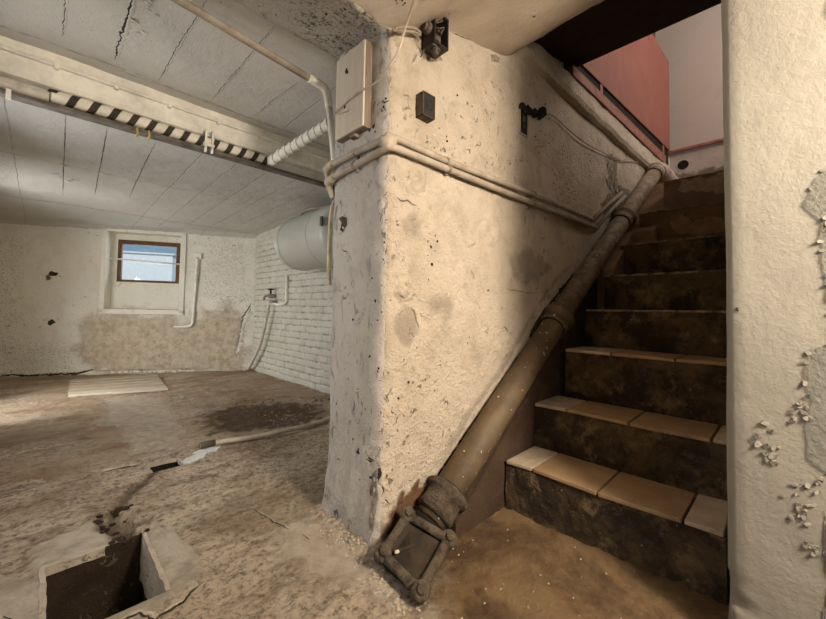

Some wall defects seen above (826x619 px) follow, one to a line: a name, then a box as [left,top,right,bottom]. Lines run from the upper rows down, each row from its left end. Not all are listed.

crack [104,0,302,129]
leakage [82,307,243,374]
crack [100,462,143,472]
leakage [182,445,221,464]
leakage [193,403,324,435]
peeling [750,421,781,466]
peeling [781,347,826,527]
crack [818,509,826,570]
crack [121,583,202,619]